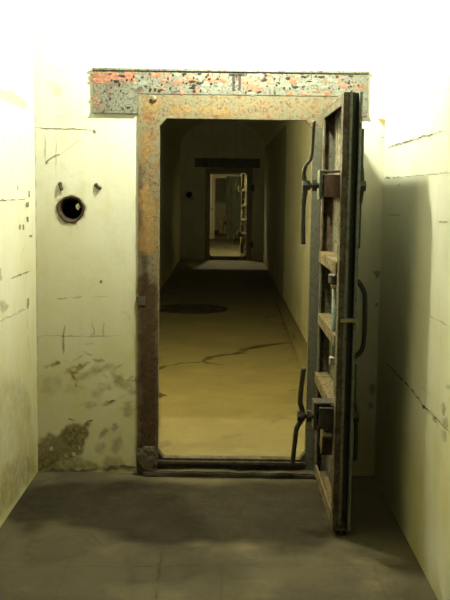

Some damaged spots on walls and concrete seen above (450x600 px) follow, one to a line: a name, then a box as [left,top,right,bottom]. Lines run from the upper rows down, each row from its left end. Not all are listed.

corrosion [138,182,158,449]
crack [159,297,292,369]
crack [387,364,449,432]
peeling [38,419,96,470]